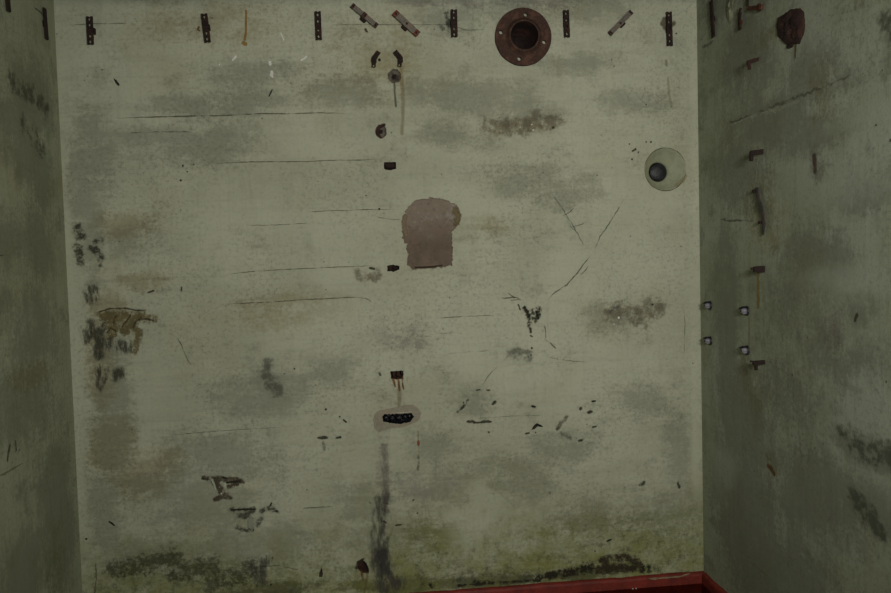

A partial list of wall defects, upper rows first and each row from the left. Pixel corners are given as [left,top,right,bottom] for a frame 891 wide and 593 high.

spalling [401,197,461,270]
mould [107,548,273,593]
leakage [371,494,402,593]
mould [457,554,651,587]